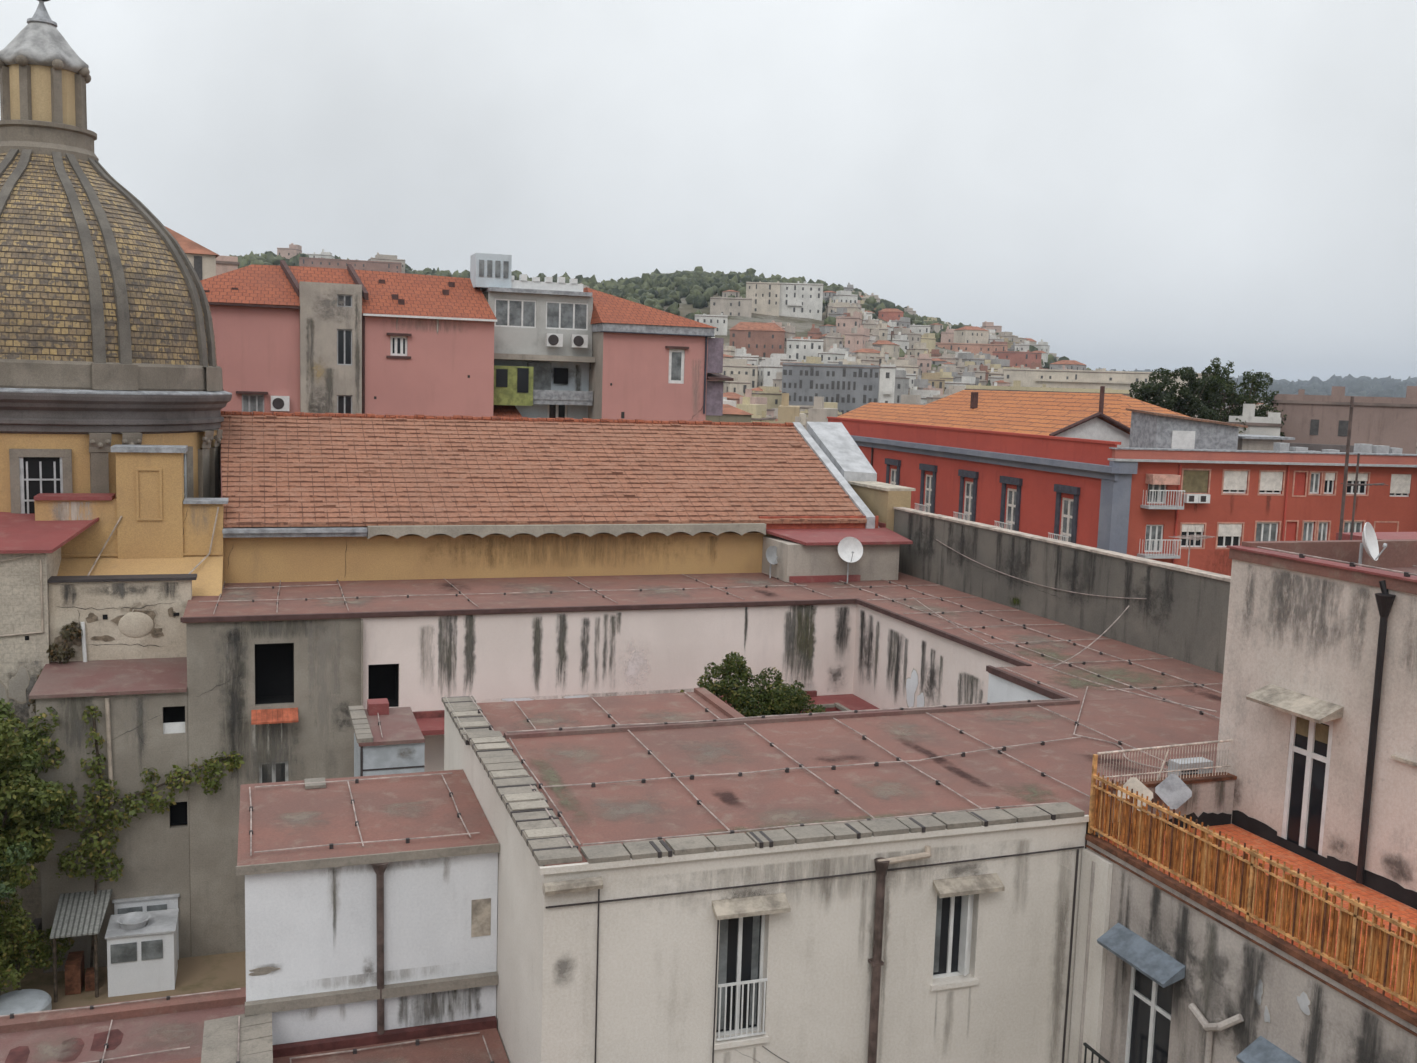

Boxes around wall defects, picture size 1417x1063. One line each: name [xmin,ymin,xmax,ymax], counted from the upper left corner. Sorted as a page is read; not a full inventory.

damp [1272,573,1335,633]
damp [439,615,475,678]
damp [534,618,542,679]
damp [559,613,621,673]
damp [785,605,815,669]
damp [836,607,943,696]
damp [222,620,312,783]
damp [958,674,982,705]
damp [1385,858,1407,880]
damp [1150,888,1264,1050]
damp [1306,986,1322,1063]
damp [1357,1012,1392,1063]